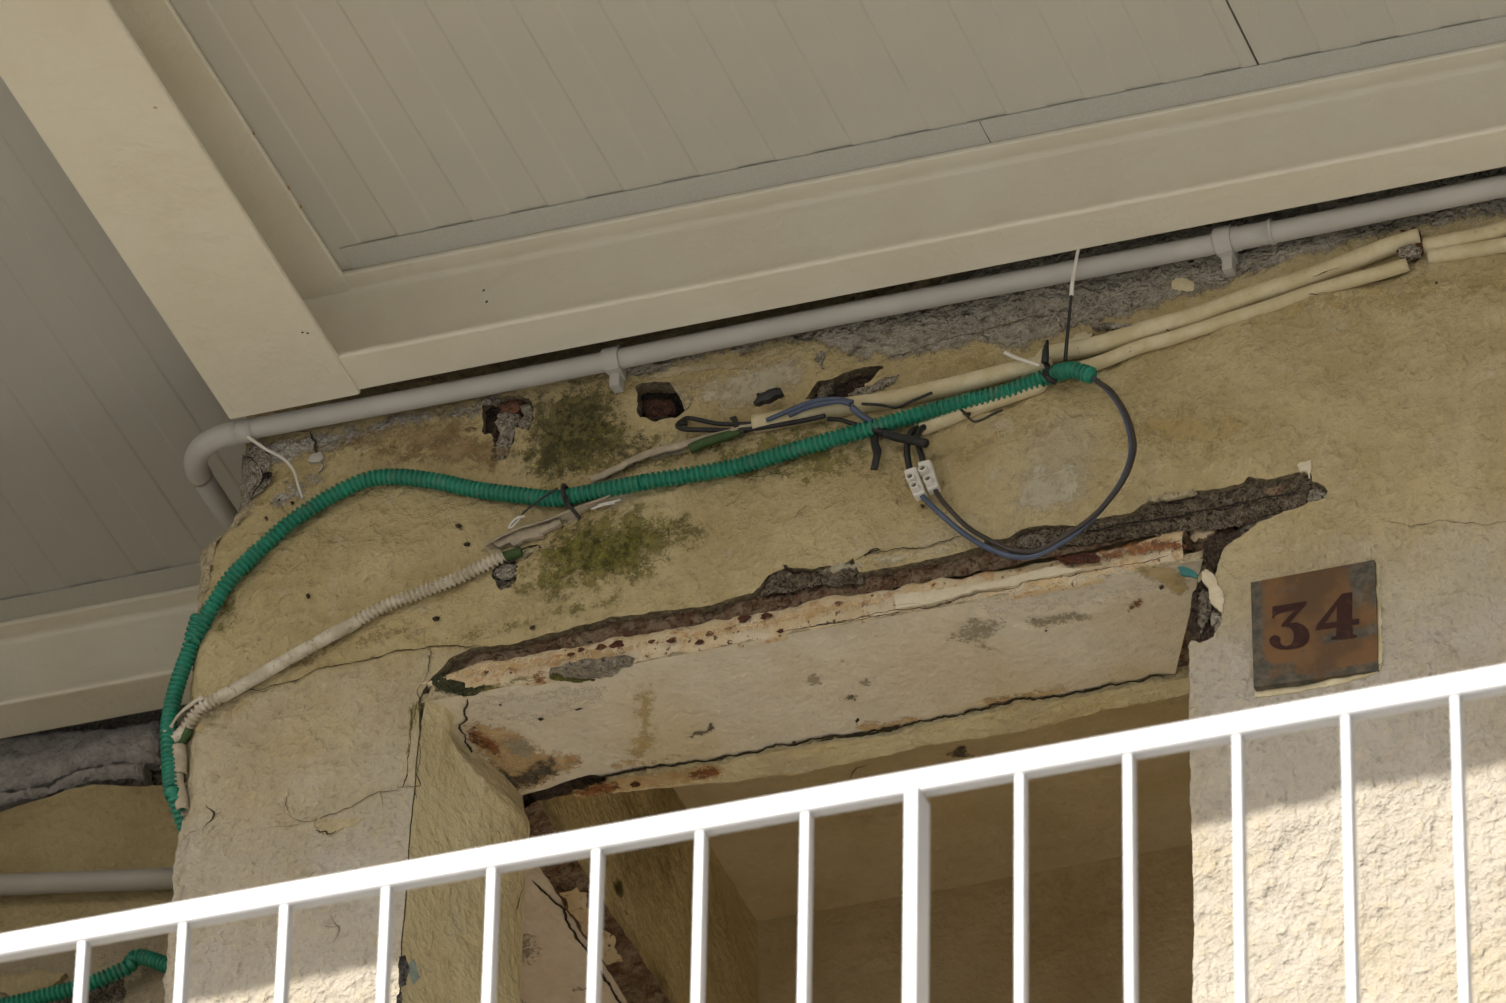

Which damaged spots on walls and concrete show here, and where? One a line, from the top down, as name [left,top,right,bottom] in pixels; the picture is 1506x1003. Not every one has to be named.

flaking render [937,166,1506,285]
flaking render [626,197,1506,422]
flaking render [197,394,540,614]
spalling [757,556,908,598]
spalling [989,460,1327,643]
spalling [549,655,635,683]
corrosion [452,595,884,685]
crack [248,645,473,827]
corrosion [466,721,584,791]
crack [593,674,1175,779]
peeling [559,888,623,965]